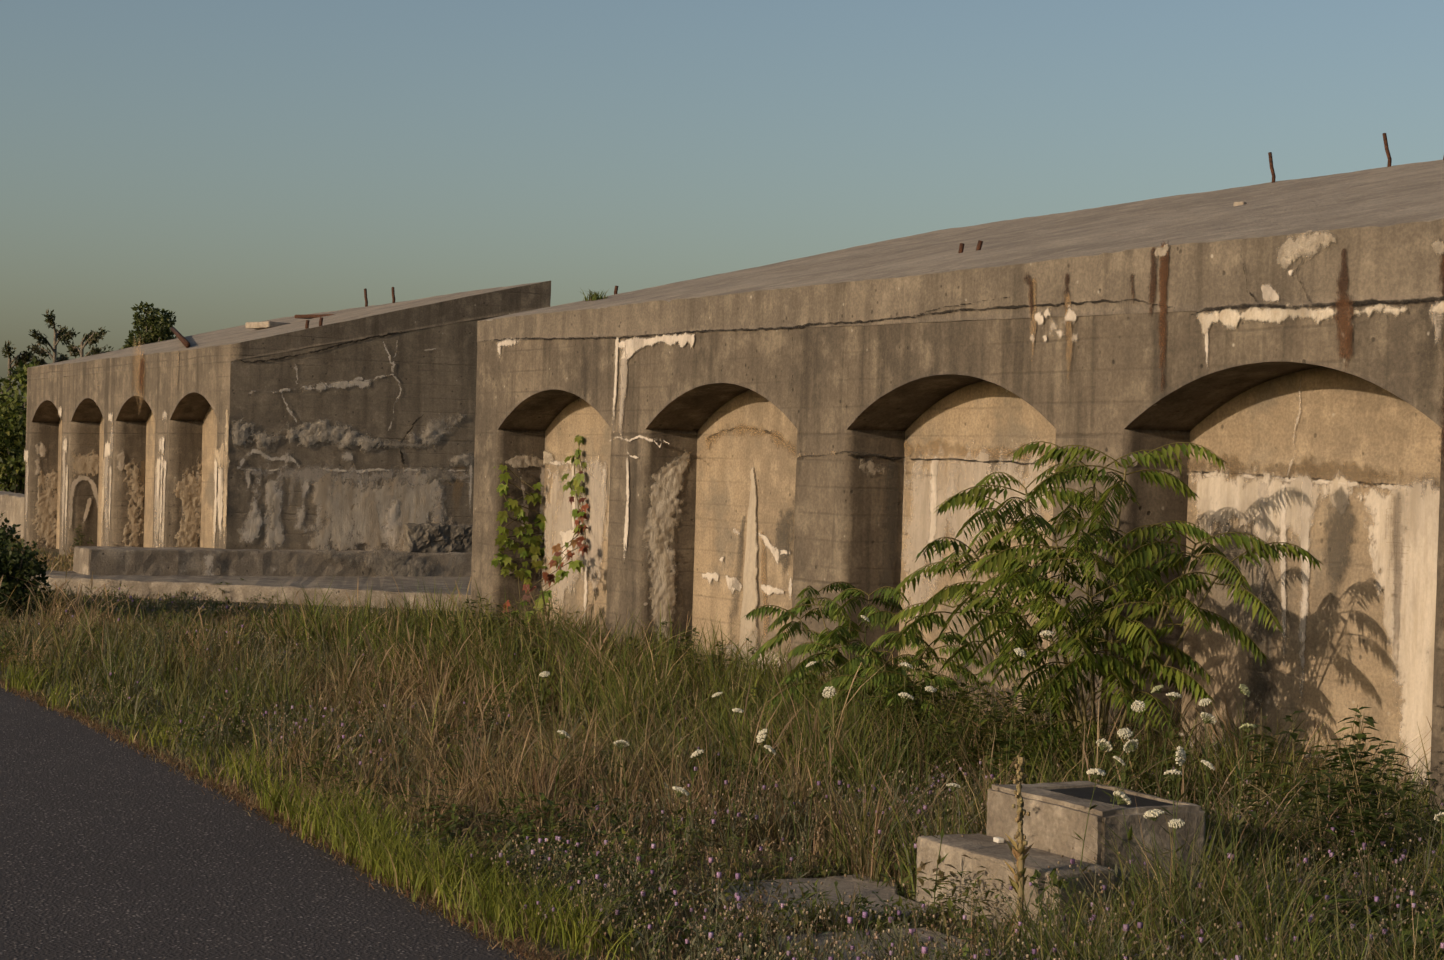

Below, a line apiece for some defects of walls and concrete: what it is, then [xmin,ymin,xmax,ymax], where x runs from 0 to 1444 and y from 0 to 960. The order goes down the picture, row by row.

crack [484,258,1444,341]
corrosion [1024,275,1036,337]
corrosion [1130,242,1169,387]
spalling [1261,285,1279,301]
spalling [1277,230,1336,276]
corrosion [1332,248,1354,367]
crack [241,331,436,469]
peeling [24,443,58,549]
peeling [104,437,202,547]
peeling [231,412,474,551]
peeling [643,452,690,644]
damp [1191,467,1440,818]